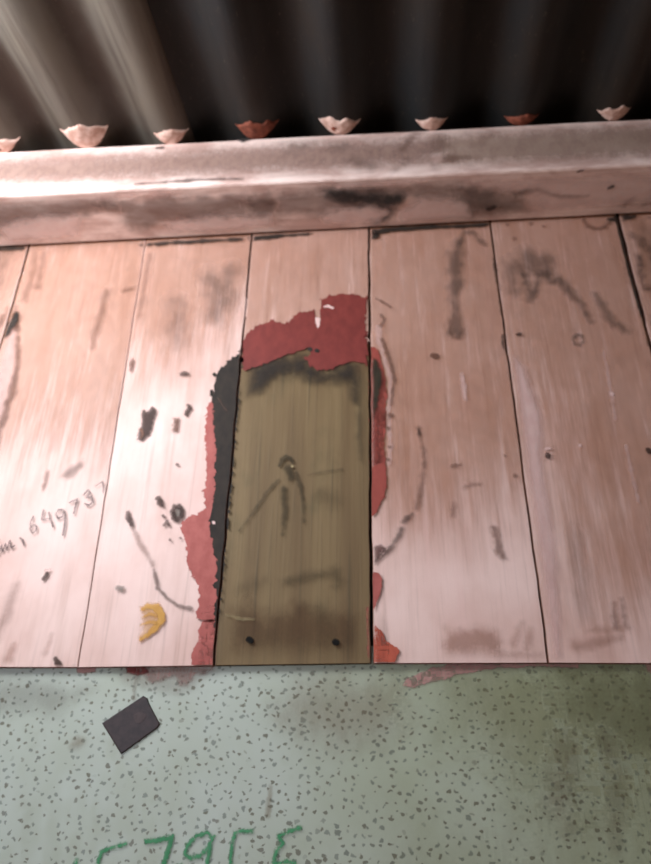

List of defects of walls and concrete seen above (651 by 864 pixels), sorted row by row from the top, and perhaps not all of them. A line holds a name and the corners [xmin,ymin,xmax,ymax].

damp [327,190,405,221]
peeling [155,293,399,665]